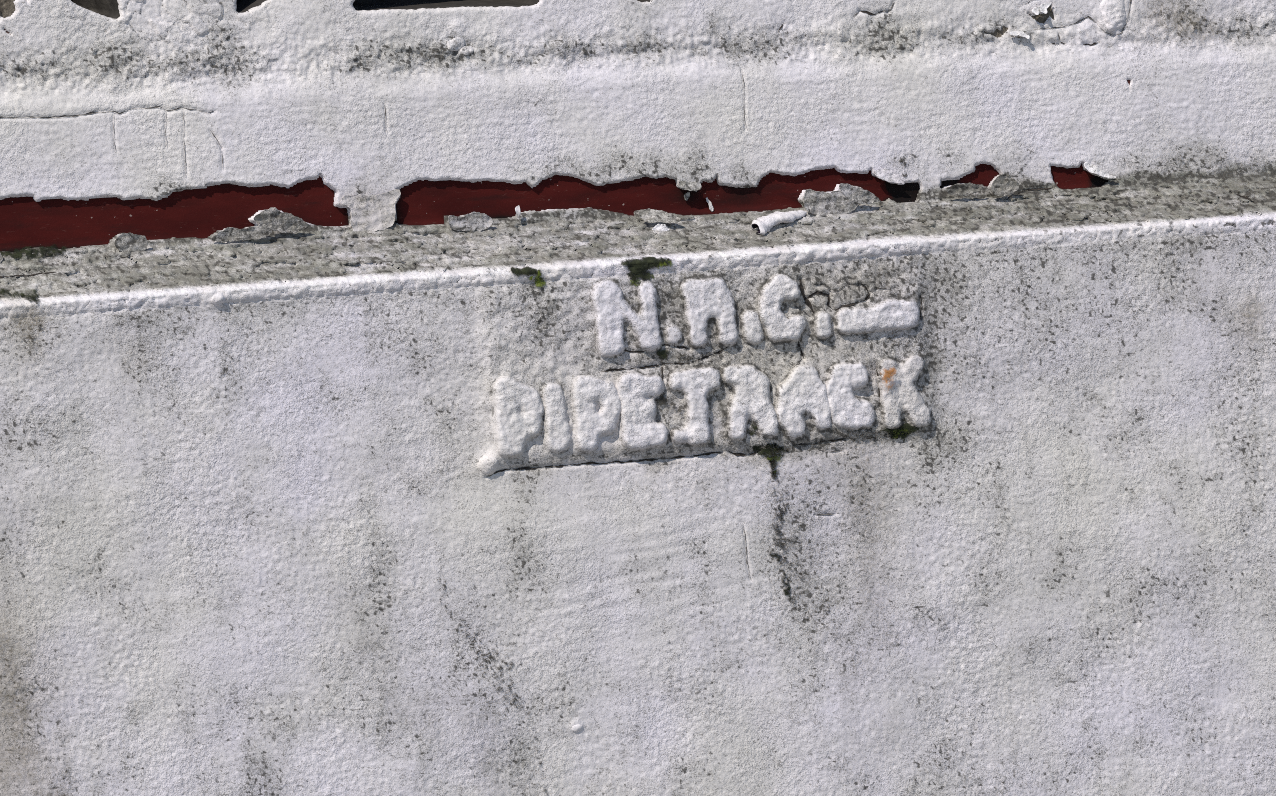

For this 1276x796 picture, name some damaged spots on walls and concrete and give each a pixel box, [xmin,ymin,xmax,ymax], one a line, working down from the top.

peeling [0,0,15,35]
peeling [984,26,1030,39]
peeling [1029,2,1055,24]
peeling [940,164,1019,196]
peeling [1051,162,1116,190]
peeling [0,168,920,263]
water stain [748,423,814,609]